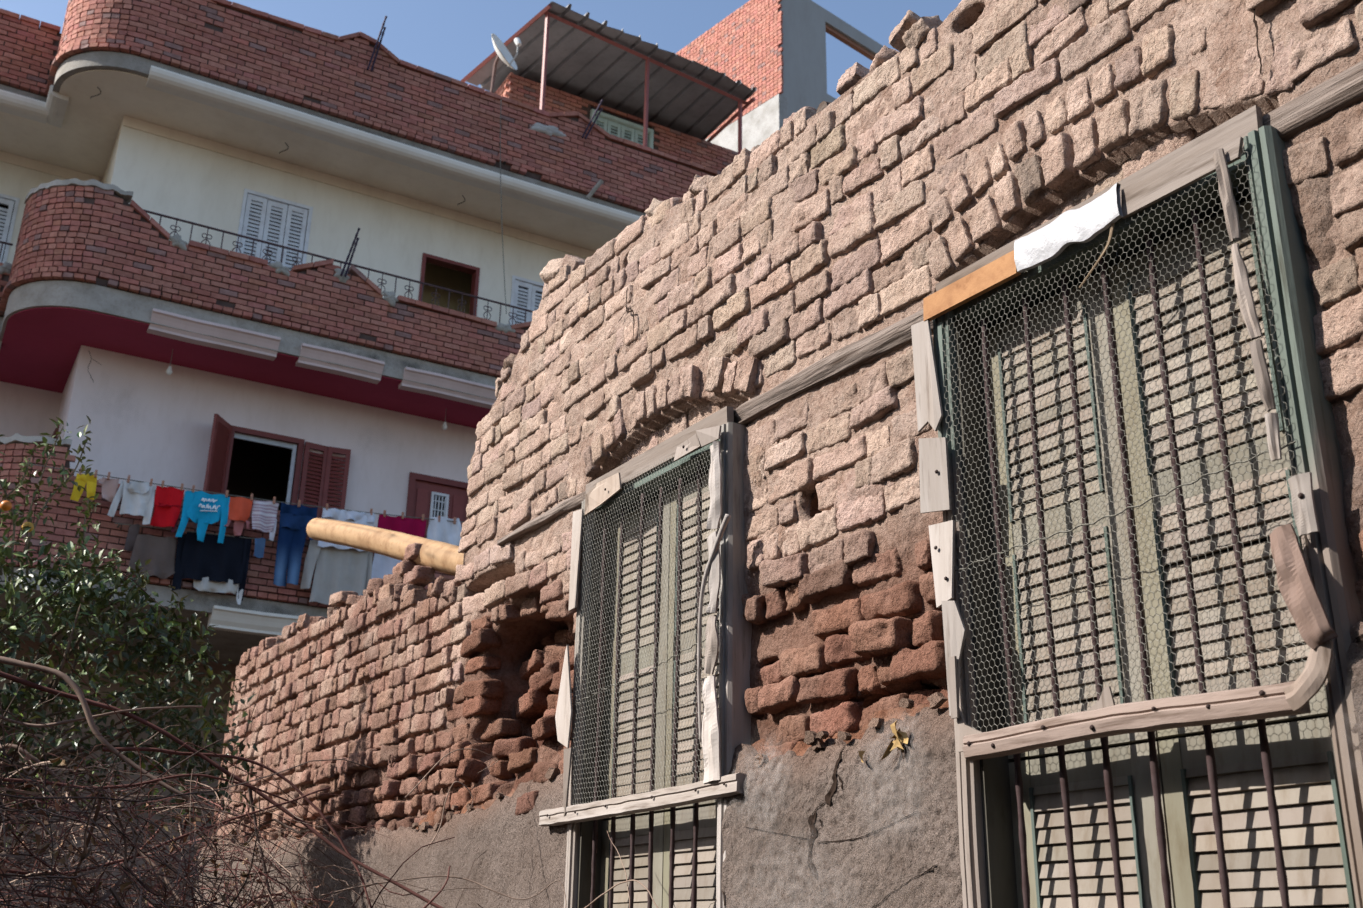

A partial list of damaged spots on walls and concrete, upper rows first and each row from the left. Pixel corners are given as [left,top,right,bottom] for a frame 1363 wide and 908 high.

flaking render [792,692,949,756]
flaking render [545,767,563,780]
flaking render [751,739,772,768]
flaking render [411,790,515,832]
crack [746,746,917,881]
crack [872,864,937,908]